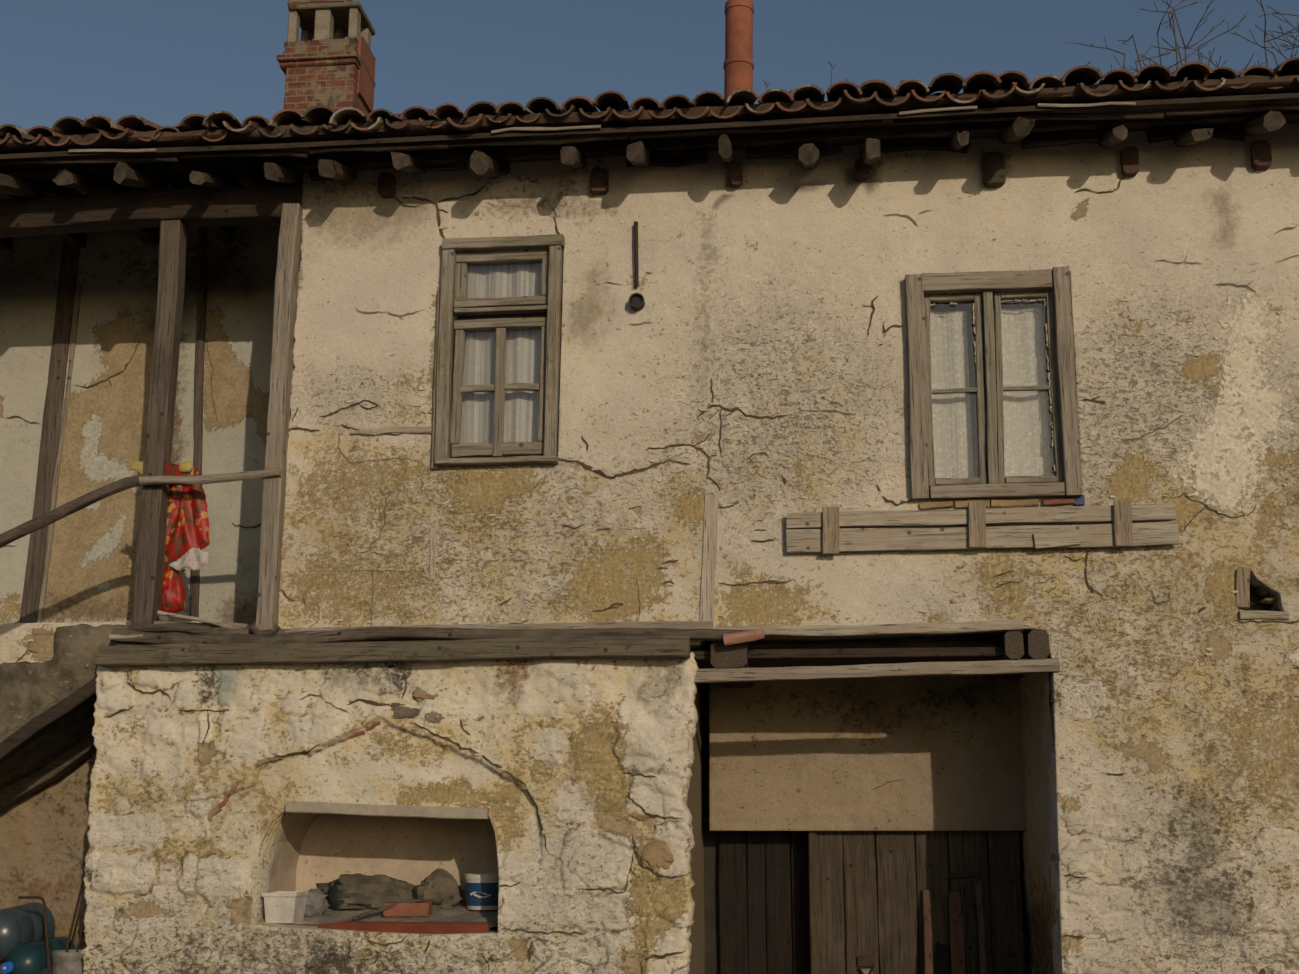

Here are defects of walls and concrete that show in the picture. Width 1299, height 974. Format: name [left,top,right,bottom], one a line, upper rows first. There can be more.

crack [392,183,488,238]
flaking render [203,306,269,444]
flaking render [0,310,155,662]
flaking render [286,430,547,529]
crack [558,378,855,542]
flaking render [1102,450,1212,532]
flaking render [1243,441,1299,542]
flaking render [278,538,434,627]
flaking render [555,533,674,622]
crack [719,577,795,586]
crack [300,672,550,851]